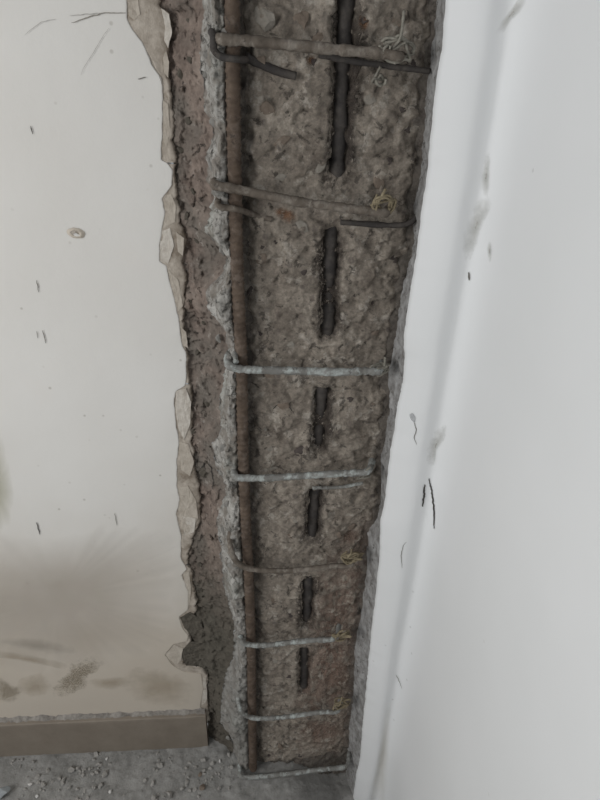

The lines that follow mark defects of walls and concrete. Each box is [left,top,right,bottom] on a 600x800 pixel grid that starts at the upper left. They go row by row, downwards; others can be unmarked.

corrosion [324,57,362,184]
corrosion [313,242,343,339]
spalling [127,0,235,752]
corrosion [309,388,333,451]
spalling [242,0,446,794]